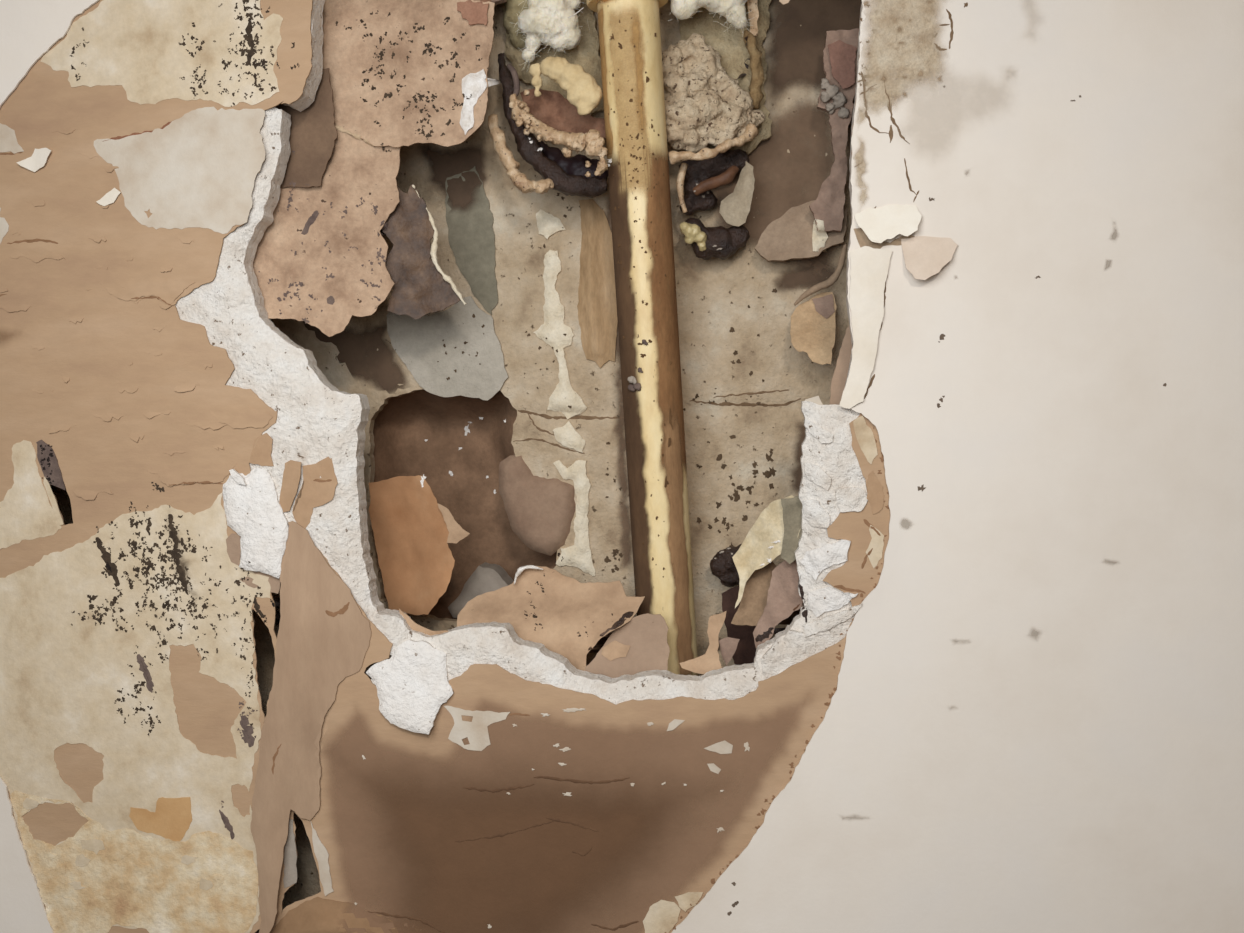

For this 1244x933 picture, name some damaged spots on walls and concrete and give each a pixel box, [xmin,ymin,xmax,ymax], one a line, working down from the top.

leakage [179,0,299,107]
leakage [712,105,834,243]
leakage [769,0,941,203]
peeling [0,0,325,578]
peeling [250,3,958,933]
peeling [8,743,104,846]
leakage [71,482,281,747]
peeling [169,592,277,817]